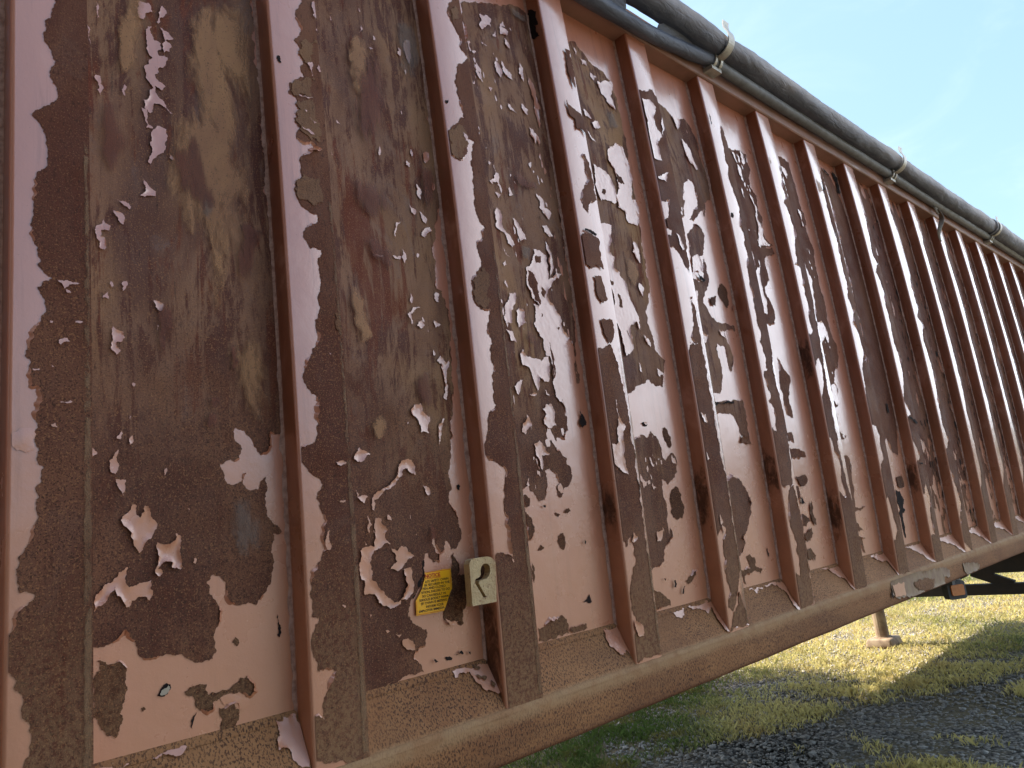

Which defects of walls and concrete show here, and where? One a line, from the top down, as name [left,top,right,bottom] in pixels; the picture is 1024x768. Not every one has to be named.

peeling [8,0,282,768]
peeling [276,0,467,768]
rust [482,607,502,697]
peeling [434,0,587,709]
peeling [565,41,1024,663]